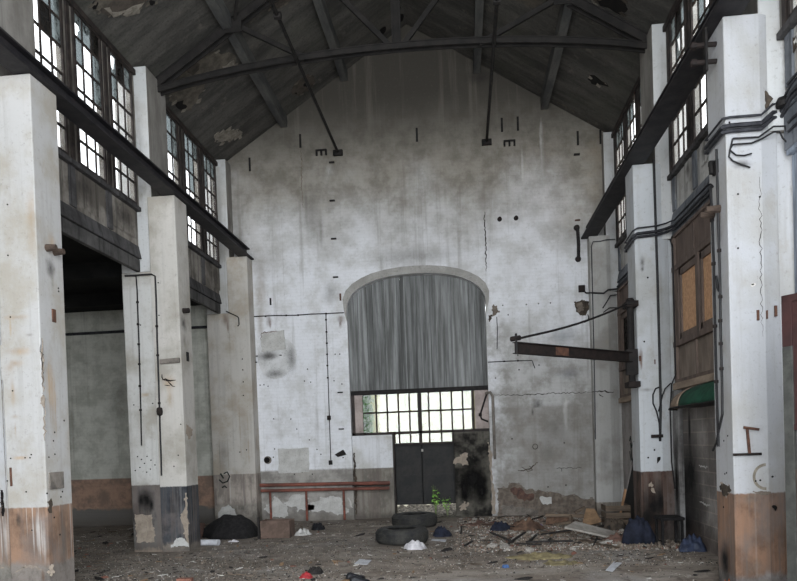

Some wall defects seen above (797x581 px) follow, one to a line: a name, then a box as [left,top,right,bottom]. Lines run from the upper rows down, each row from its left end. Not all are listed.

peeling [214,126,242,146]
crack [481,215,489,269]
crack [756,177,764,334]
water stain [461,464,486,502]
flaking render [487,442,595,516]
peeling [135,514,156,543]
peeling [171,493,190,547]
water stain [737,555,770,581]